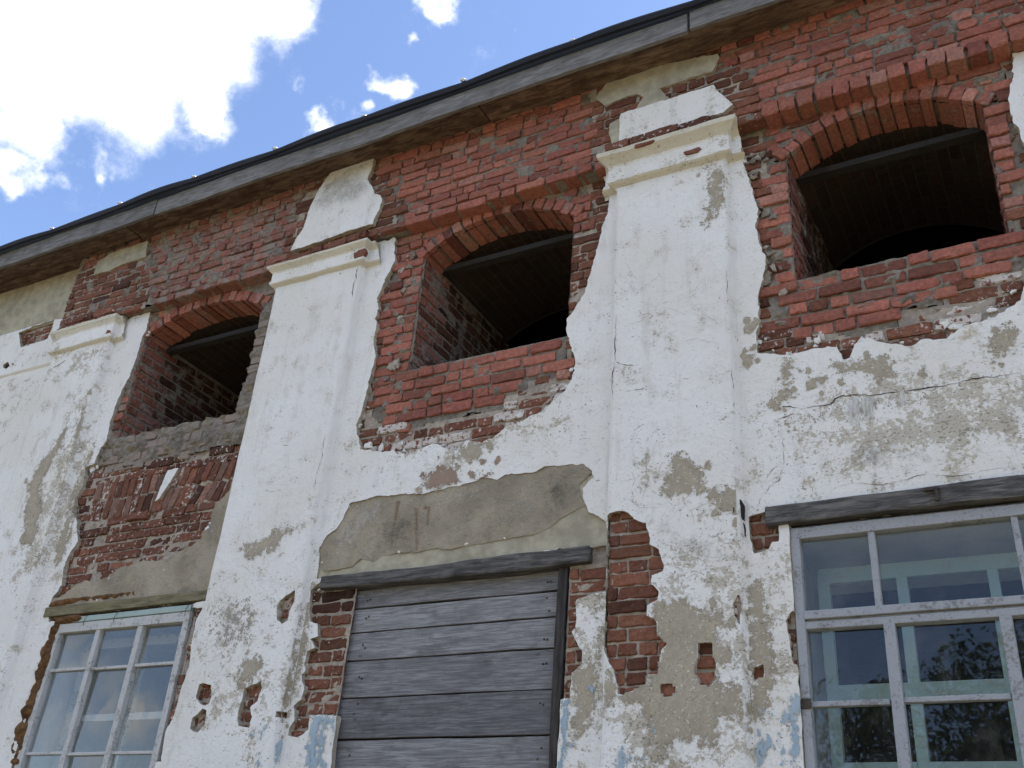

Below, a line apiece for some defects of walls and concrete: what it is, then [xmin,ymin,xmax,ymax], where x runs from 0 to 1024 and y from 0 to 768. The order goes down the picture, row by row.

flaking render [992,58,1013,97]
flaking render [569,180,609,316]
flaking render [737,130,1024,430]
flaking render [19,389,241,612]
peeling [236,524,298,563]
peeling [320,238,592,571]
peeling [659,450,779,553]
crack [758,373,1016,505]
flaking render [194,684,212,732]
peeling [233,649,266,738]
flaking render [280,582,358,749]
peeling [561,512,784,768]